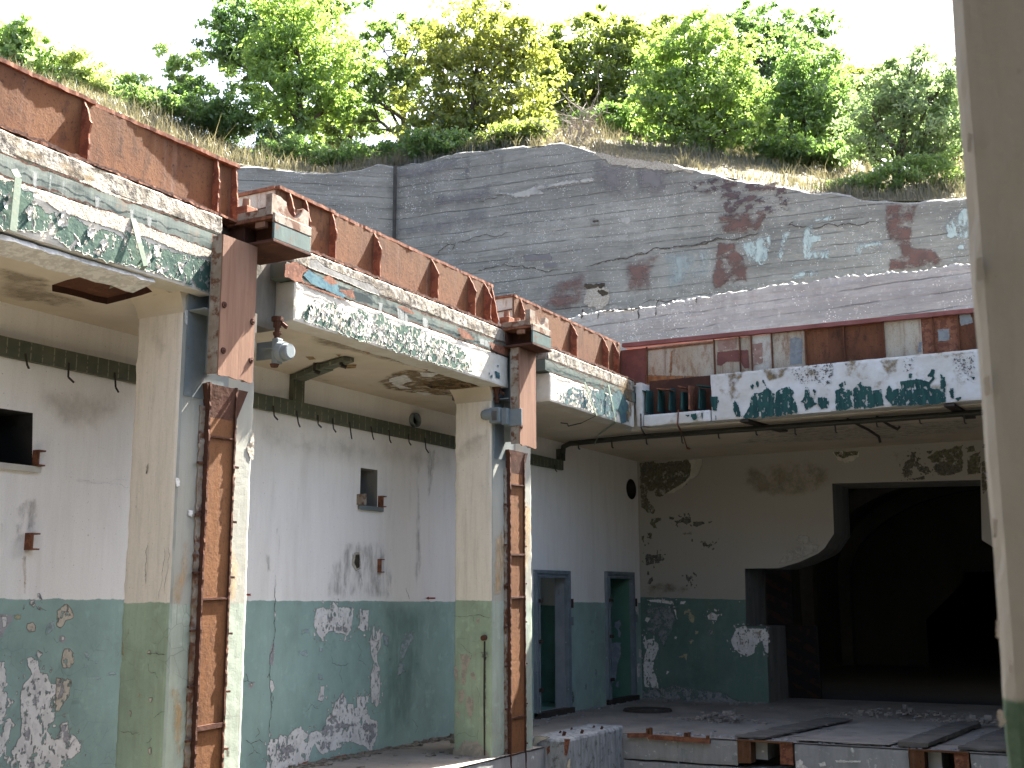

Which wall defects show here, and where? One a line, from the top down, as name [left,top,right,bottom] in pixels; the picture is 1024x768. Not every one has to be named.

peeling [0,178,211,294]
crack [585,233,758,267]
crack [789,221,876,229]
corrosion [285,262,355,300]
peeling [303,270,477,396]
corrosion [489,342,509,356]
crack [581,298,697,319]
peeling [733,369,961,419]
peeling [635,595,722,691]
peeling [726,623,772,659]
peeling [0,604,86,768]
peeling [262,599,385,768]